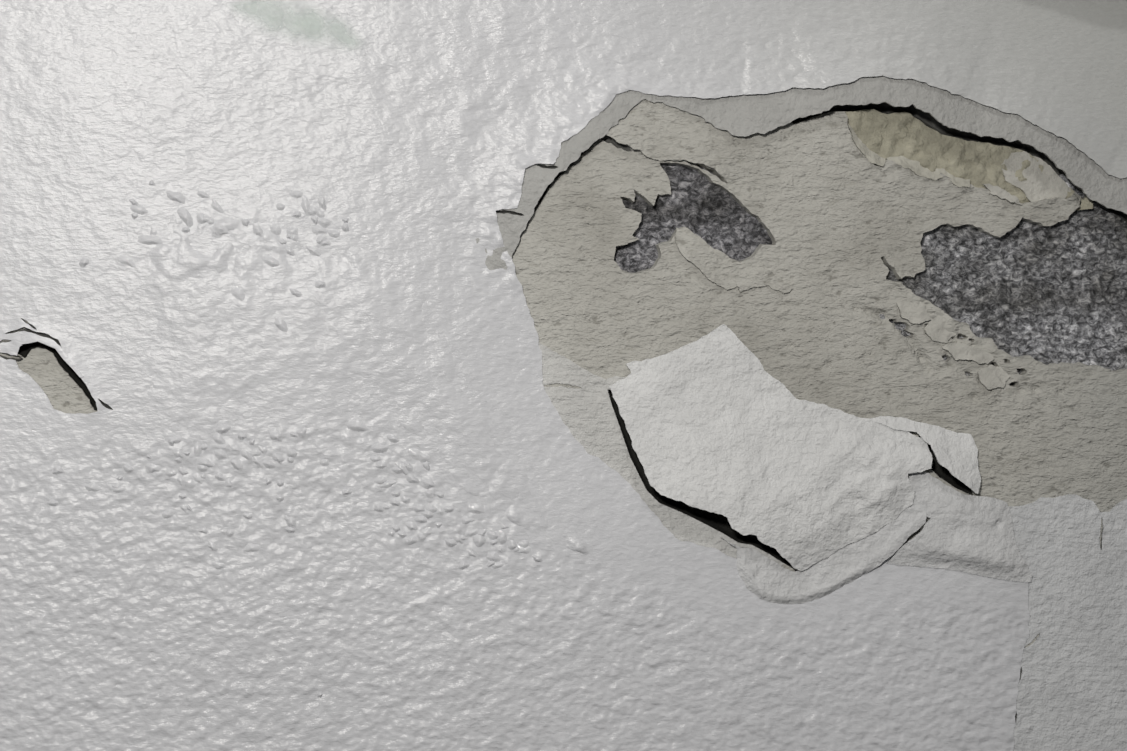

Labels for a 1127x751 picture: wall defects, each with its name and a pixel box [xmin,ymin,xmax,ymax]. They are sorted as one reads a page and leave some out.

peeling [0,318,113,414]
peeling [476,76,1127,751]